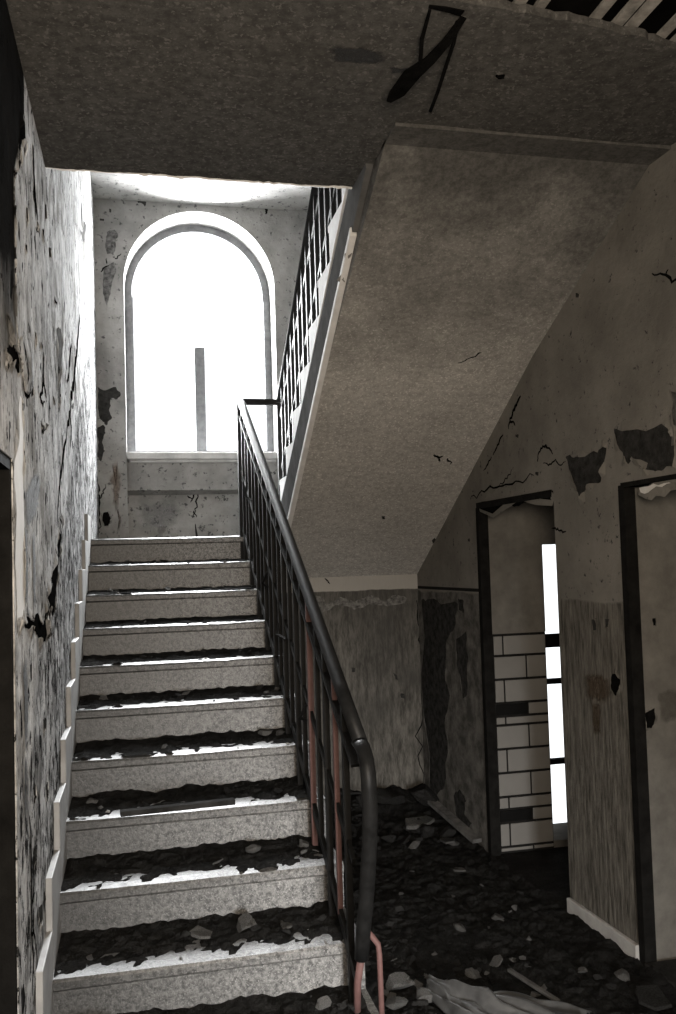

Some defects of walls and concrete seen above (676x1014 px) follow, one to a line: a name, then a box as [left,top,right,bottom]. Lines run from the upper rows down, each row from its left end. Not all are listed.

spalling [5,113,52,378]
crack [23,315,80,512]
peeling [97,384,122,461]
crack [471,396,566,499]
spalling [566,385,676,506]